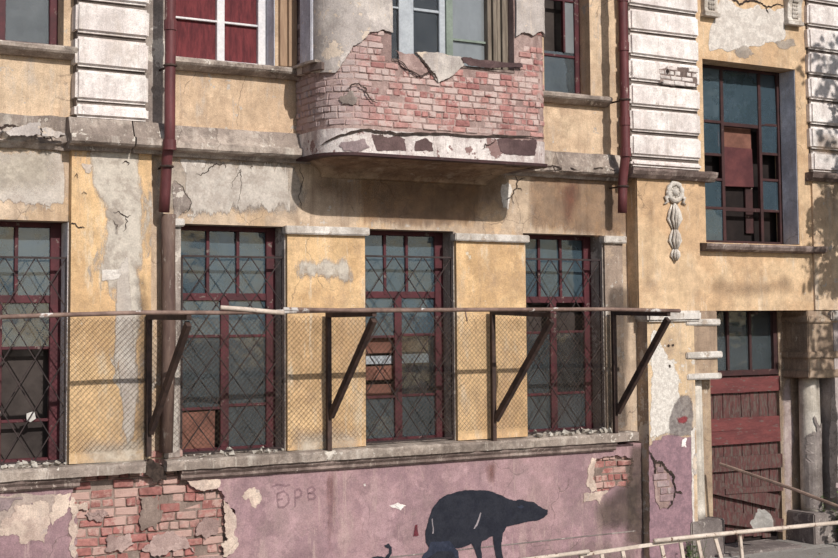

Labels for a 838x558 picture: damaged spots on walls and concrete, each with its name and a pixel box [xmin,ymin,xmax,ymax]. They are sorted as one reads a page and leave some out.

peeling [708,0,795,58]
crack [733,0,783,12]
crack [0,124,19,139]
peeling [339,134,433,152]
peeling [497,138,537,156]
peeling [170,159,303,218]
crack [508,165,616,203]
peeling [82,151,161,446]
spalling [0,364,239,558]
peeling [242,487,262,508]
spalling [583,455,631,504]
peeling [649,330,695,558]